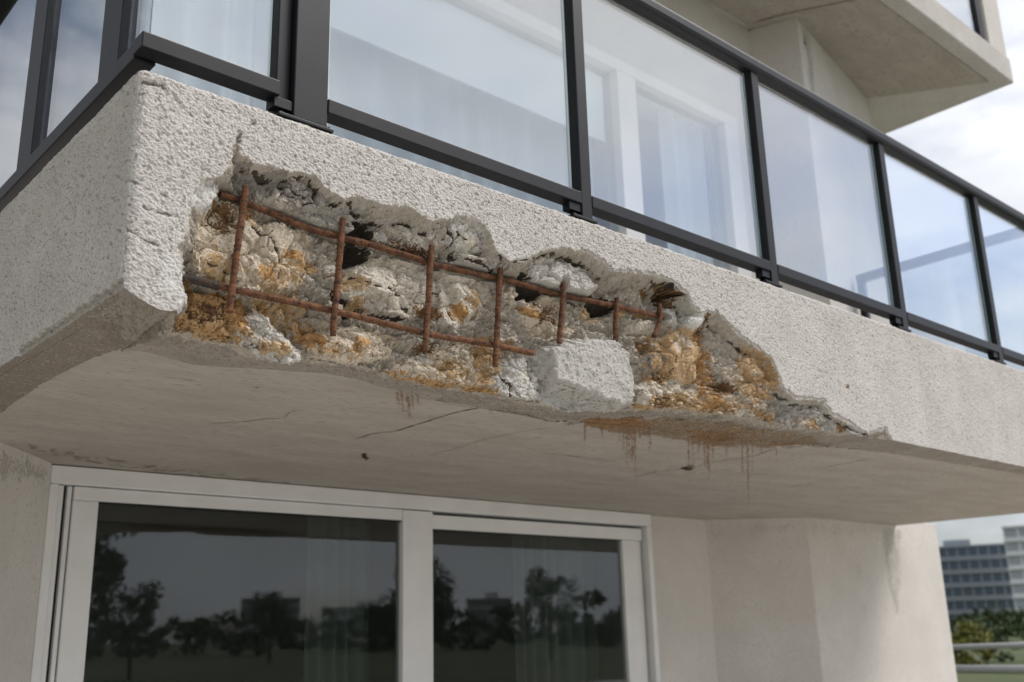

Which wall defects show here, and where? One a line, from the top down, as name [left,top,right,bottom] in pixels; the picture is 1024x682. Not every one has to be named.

corrosion [171,199,379,362]
corrosion [386,234,428,259]
corrosion [408,304,444,323]
corrosion [464,278,495,321]
spalling [158,143,893,440]
corrosion [530,303,598,327]
corrosion [379,336,516,418]
crack [357,361,568,455]
corrosion [576,283,847,500]